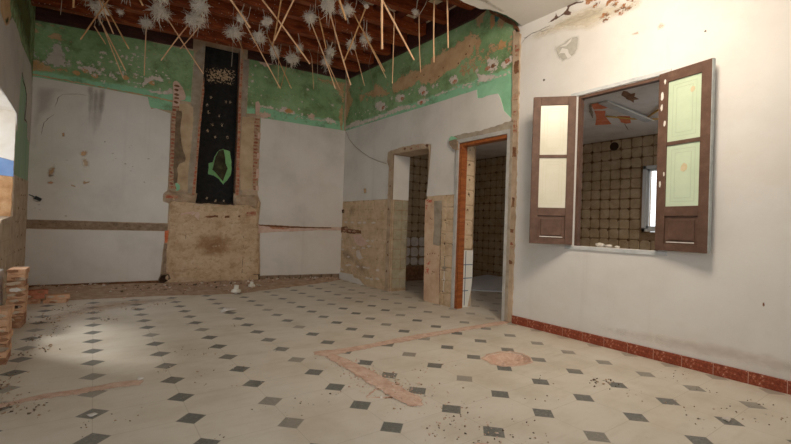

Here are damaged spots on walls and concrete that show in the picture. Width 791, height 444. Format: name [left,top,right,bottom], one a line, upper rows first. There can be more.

flaking render [548,0,633,23]
flaking render [33,23,260,283]
flaking render [235,10,521,322]